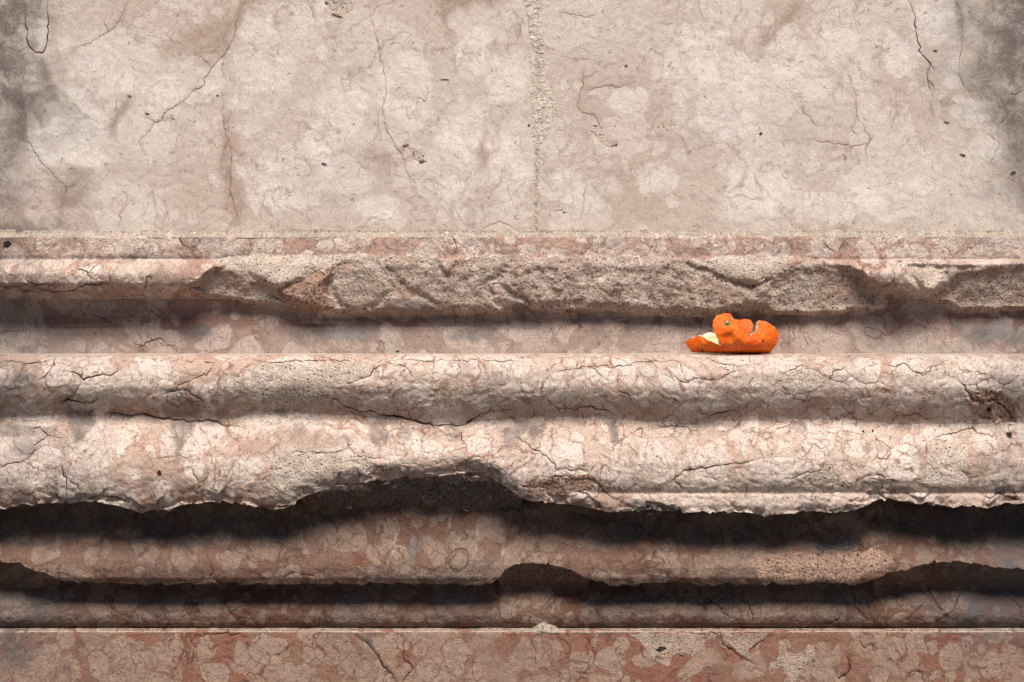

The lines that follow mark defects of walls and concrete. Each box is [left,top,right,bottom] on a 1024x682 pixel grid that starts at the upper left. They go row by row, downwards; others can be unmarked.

crack [25,3,49,53]
spalling [188,254,889,354]
spalling [923,261,1024,314]
crack [2,356,247,429]
crack [550,356,741,437]
crack [787,321,1016,422]
crack [1,426,128,502]
spalling [306,457,597,512]
crack [256,358,662,551]
spalling [611,502,684,515]
crack [669,458,761,489]
spalling [855,476,895,495]